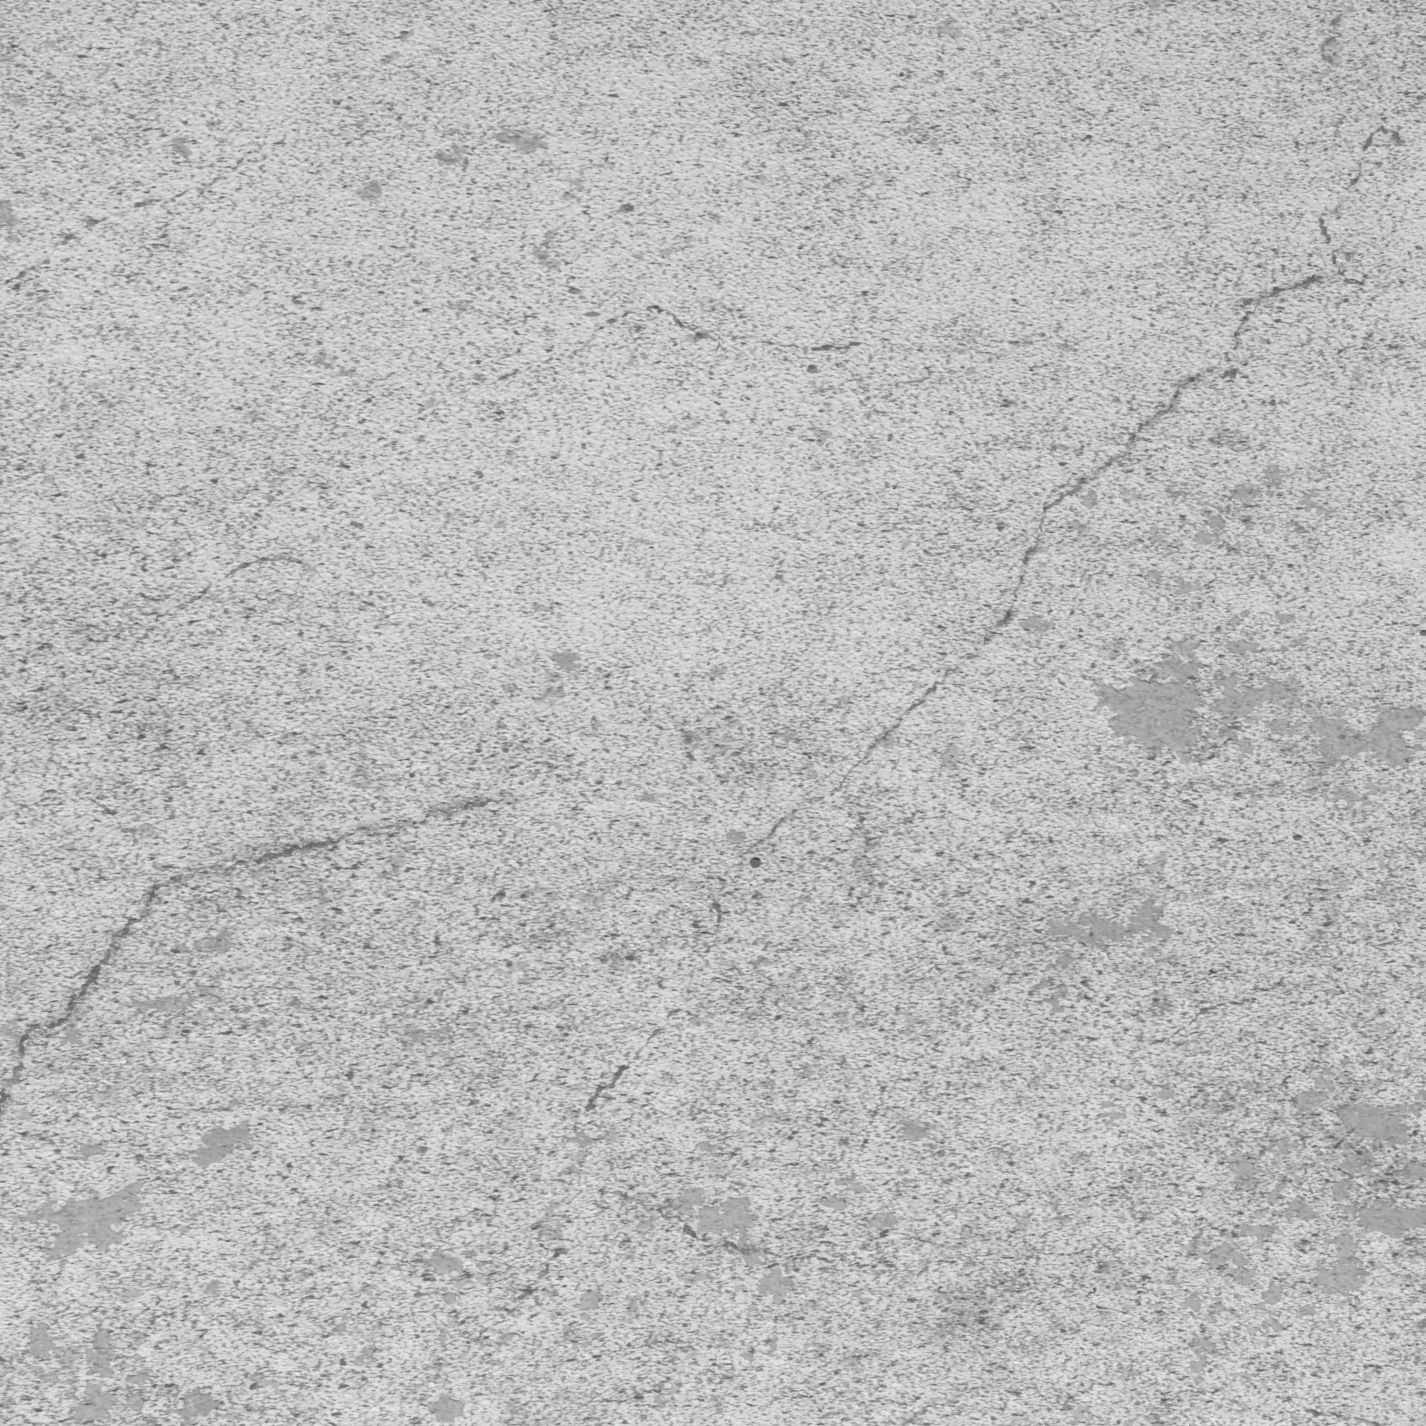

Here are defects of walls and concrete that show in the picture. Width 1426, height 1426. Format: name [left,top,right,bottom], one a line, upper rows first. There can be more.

crack [608,306,744,351]
crack [817,342,860,351]
crack [1133,213,1353,441]
peeling [1068,490,1097,530]
peeling [1194,514,1226,544]
peeling [1133,564,1200,595]
crack [831,489,1080,796]
peeling [1225,610,1260,655]
peeling [1275,614,1308,651]
peeling [1090,637,1426,768]
crack [0,840,337,1103]
crack [574,1009,679,1130]